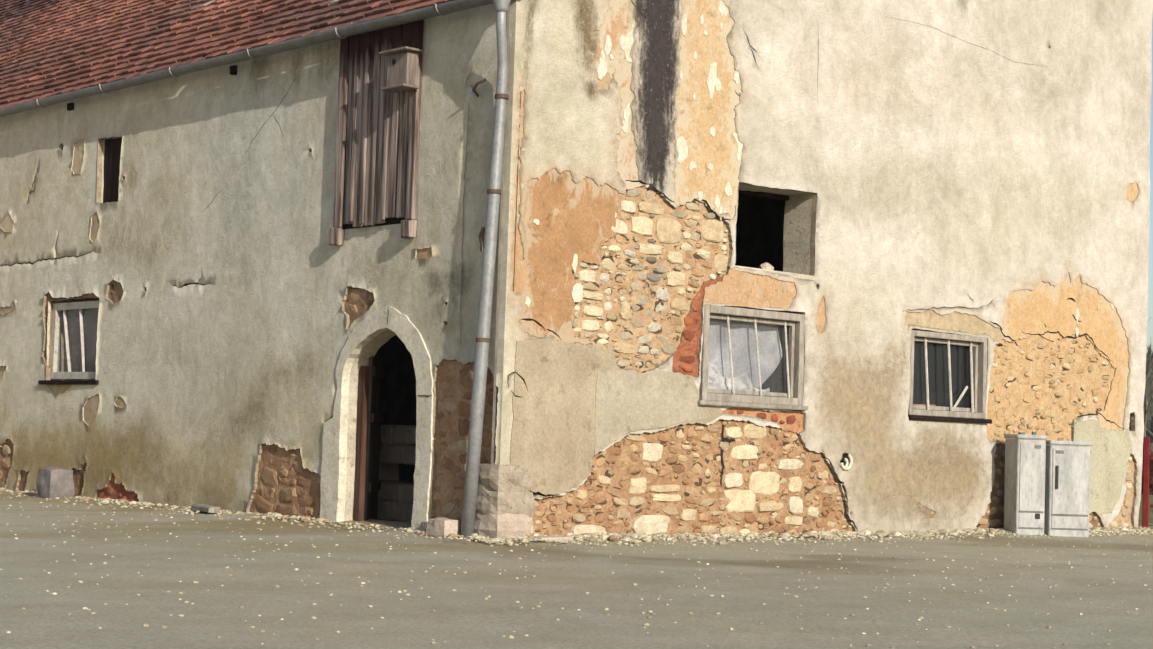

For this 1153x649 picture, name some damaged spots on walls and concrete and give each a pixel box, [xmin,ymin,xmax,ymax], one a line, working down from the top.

leakage [635,0,676,189]
flaking render [670,0,743,222]
flaking render [669,267,796,377]
flaking render [905,273,1131,431]
flaking render [0,439,29,491]
flaking render [73,463,87,497]
flaking render [97,474,139,502]
flaking render [250,444,321,520]
flaking render [433,359,535,538]
flaking render [723,408,803,436]
flaking render [978,441,1005,529]
flaking render [1089,512,1102,528]